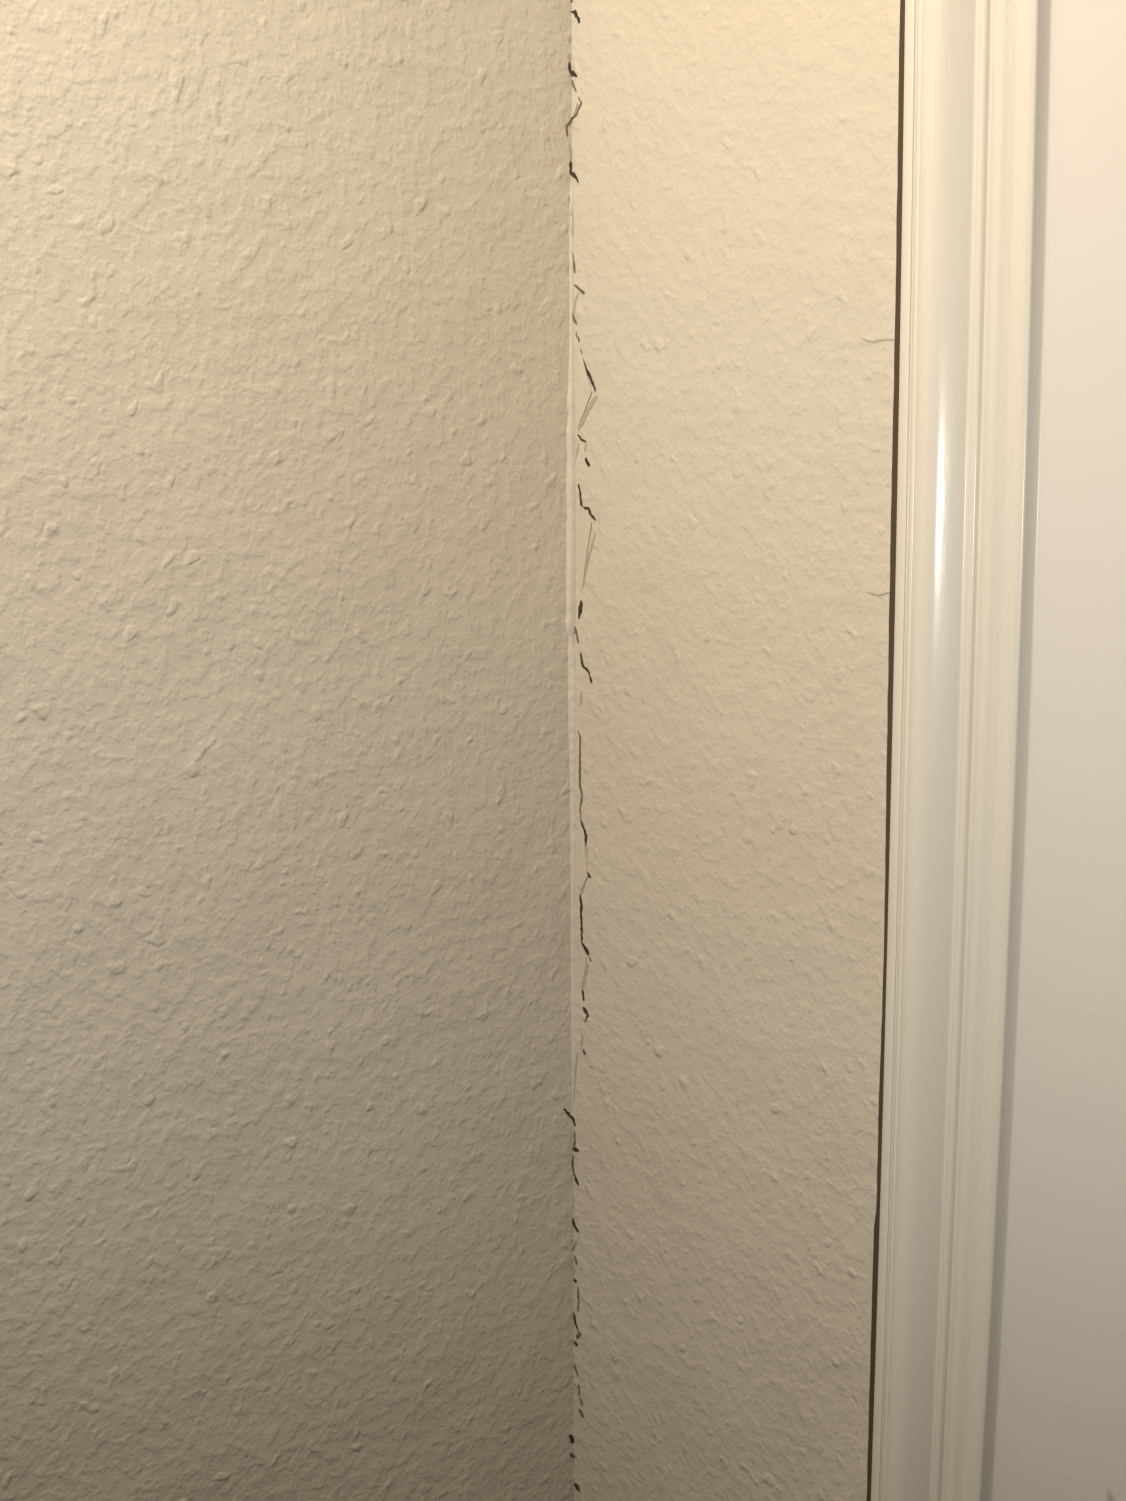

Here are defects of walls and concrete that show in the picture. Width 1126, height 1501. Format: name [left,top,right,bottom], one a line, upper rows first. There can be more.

crack [564,0,597,1492]